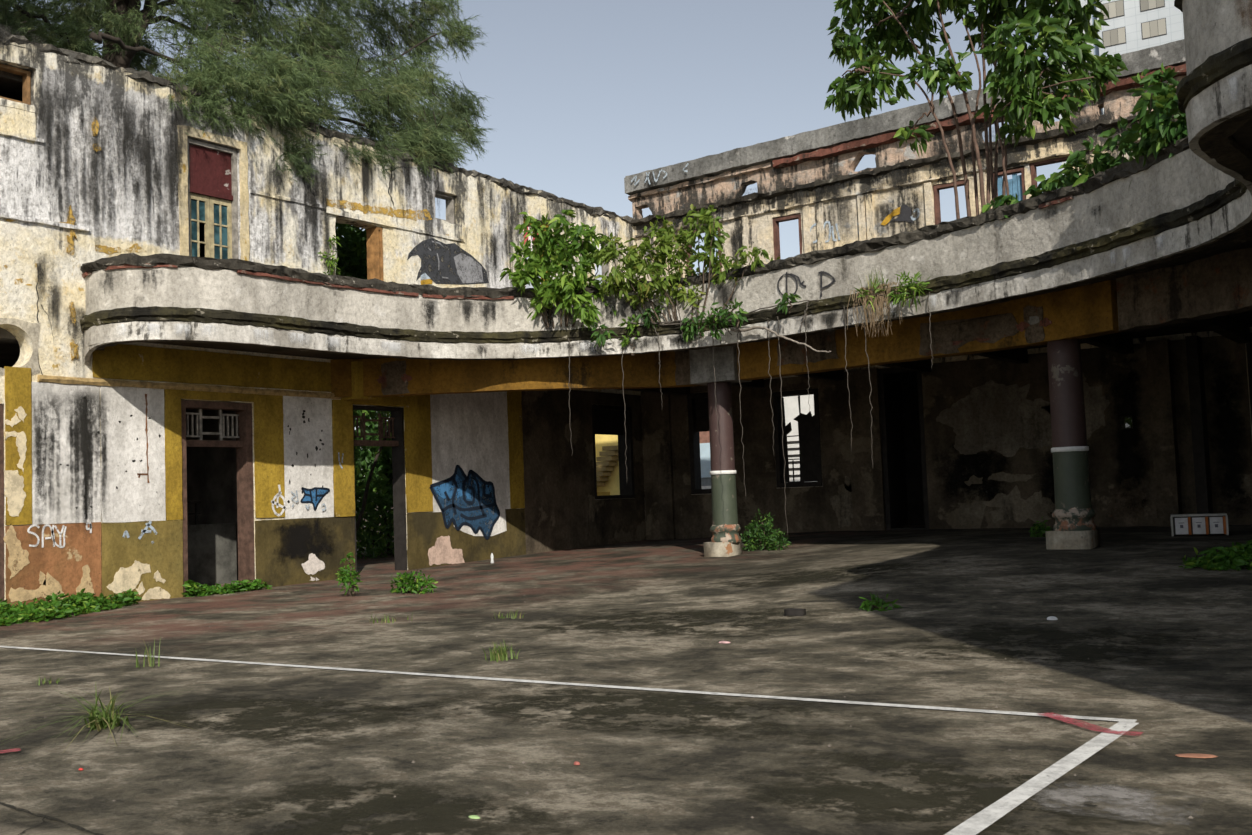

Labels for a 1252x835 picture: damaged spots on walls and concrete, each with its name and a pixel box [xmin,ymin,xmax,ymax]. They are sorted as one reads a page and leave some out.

leakage [39,91,187,231]
leakage [362,157,373,199]
leakage [304,172,329,264]
leakage [480,181,526,269]
leakage [731,229,742,261]
leakage [34,397,106,514]
peeling [936,380,1052,457]
peeling [1082,373,1110,440]
peeling [3,406,170,602]
peeling [958,472,1055,529]
peeling [301,553,325,581]
peeling [428,535,465,566]